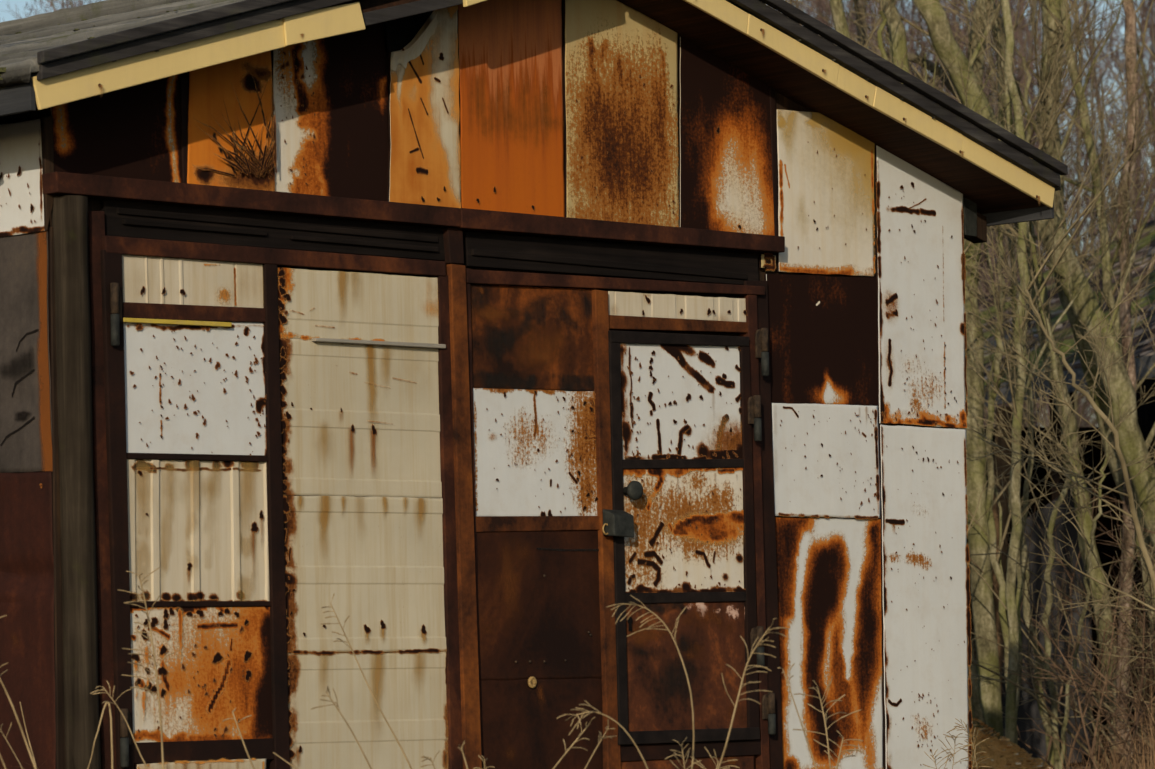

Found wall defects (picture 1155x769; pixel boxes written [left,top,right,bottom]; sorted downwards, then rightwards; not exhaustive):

rust [275,22,388,201]
rust [566,29,790,236]
rust [217,267,237,306]
rust [559,295,592,328]
rust [131,326,264,476]
rust [277,268,448,769]
rust [473,372,598,516]
rust [620,344,746,593]
rust [763,150,973,769]
rust [130,590,273,743]
rust [137,758,265,769]